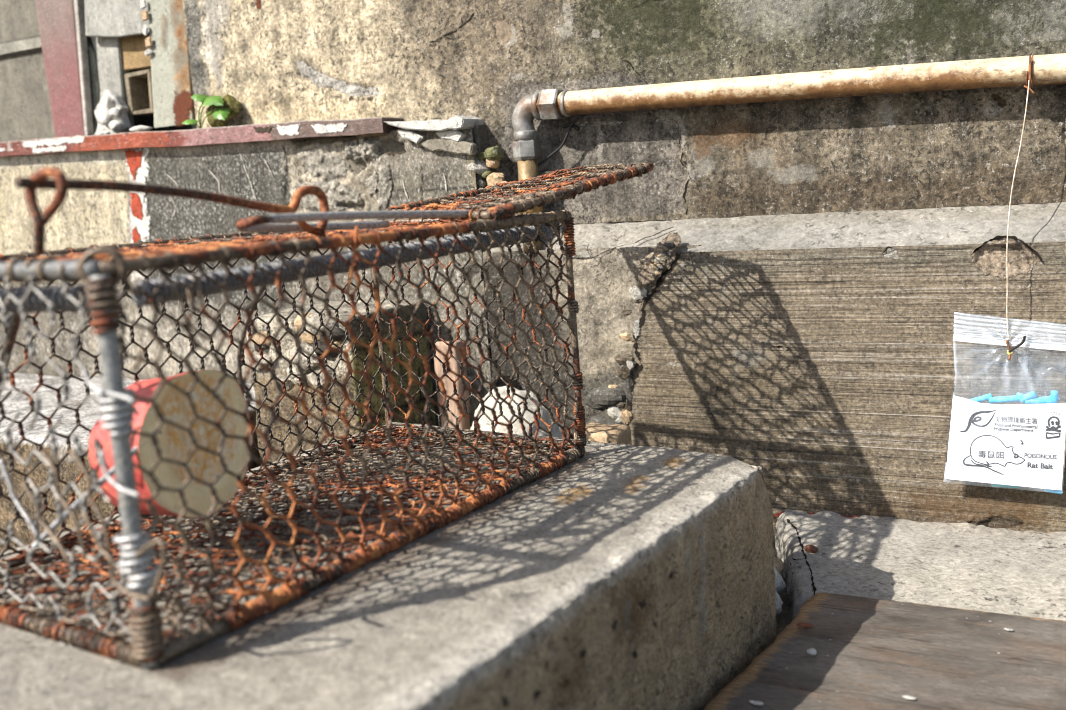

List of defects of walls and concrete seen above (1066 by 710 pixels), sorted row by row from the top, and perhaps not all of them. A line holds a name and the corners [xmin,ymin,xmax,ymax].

peeling [0,135,84,153]
spalling [971,235,1042,279]
spalling [607,233,682,425]
crack [786,518,817,595]